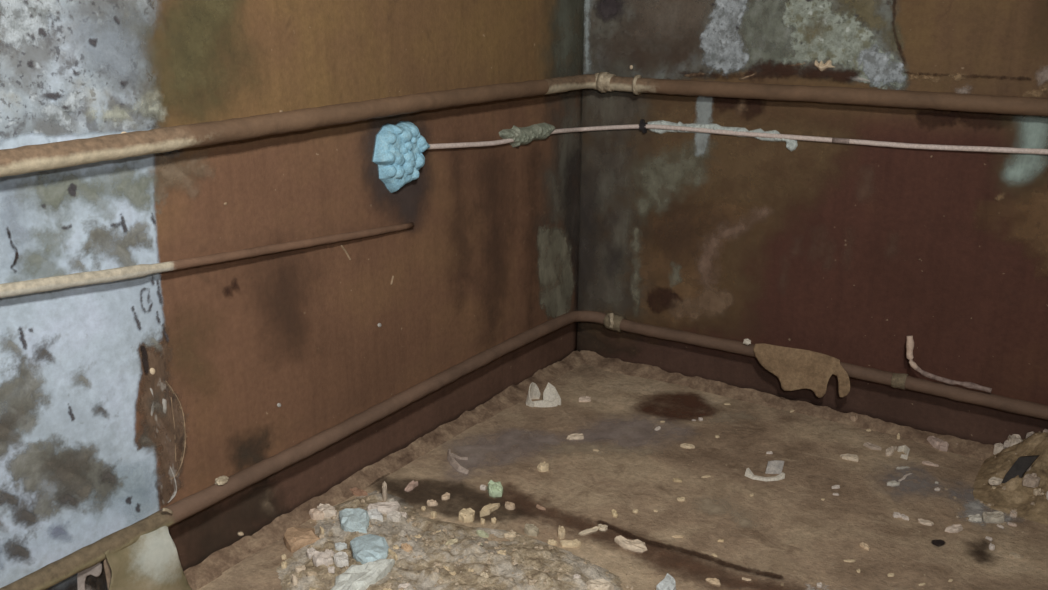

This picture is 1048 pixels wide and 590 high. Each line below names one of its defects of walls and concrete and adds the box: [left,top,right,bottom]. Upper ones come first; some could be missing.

flaking render [0,0,158,150]
peeling [583,0,871,83]
peeling [818,0,907,90]
crack [892,0,1030,94]
water stain [546,89,850,354]
flaking render [0,149,192,590]
peeling [743,339,850,398]
water stain [0,328,123,537]
water stain [5,538,30,560]